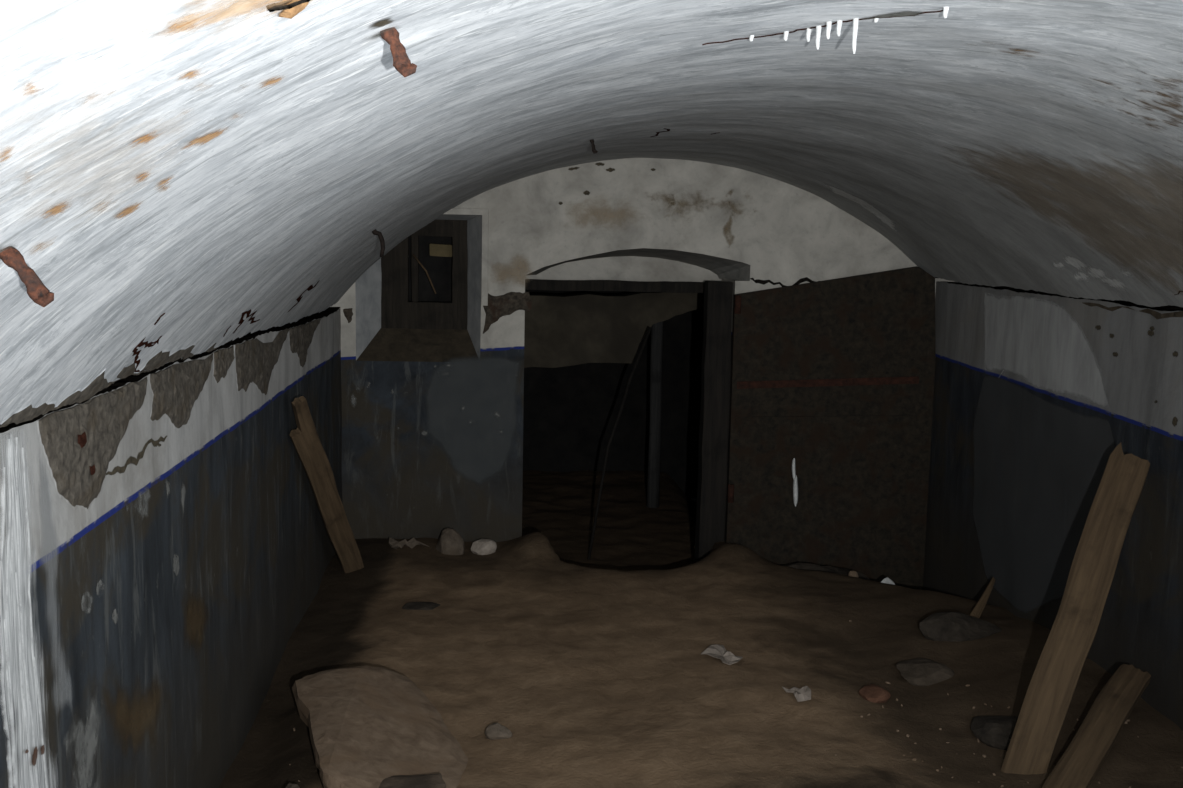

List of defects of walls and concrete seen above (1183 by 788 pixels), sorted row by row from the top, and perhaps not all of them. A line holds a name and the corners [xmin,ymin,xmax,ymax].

rust [41,203,67,218]
rust [115,204,139,218]
crack [935,277,1183,311]
crack [0,280,340,433]
flaking render [0,317,324,515]
damp [0,434,55,788]
peeling [81,580,104,613]